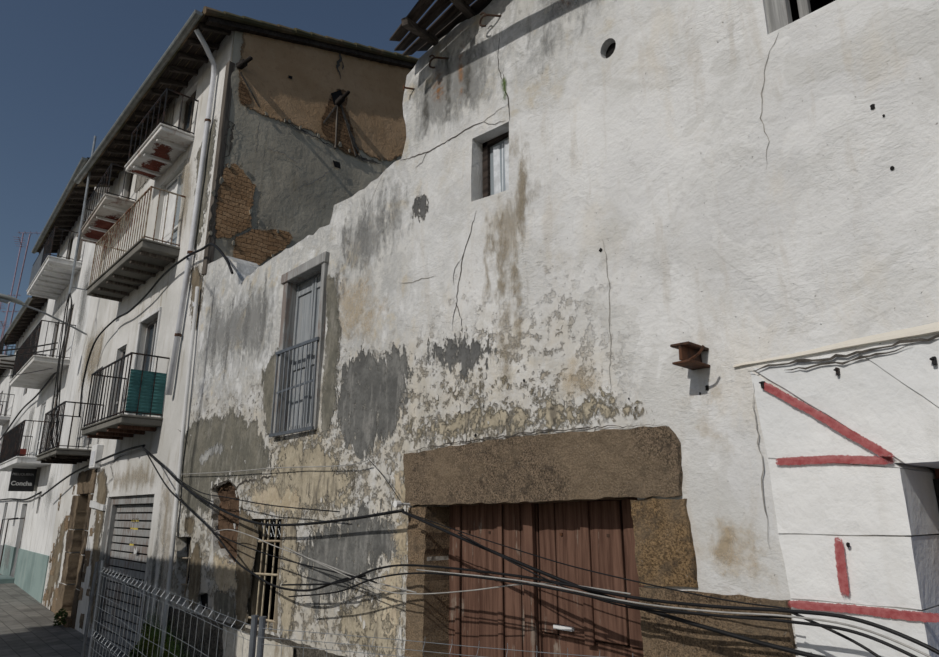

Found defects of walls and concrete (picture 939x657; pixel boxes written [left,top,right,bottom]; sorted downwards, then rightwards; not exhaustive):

spalling [238,32,411,161]
crack [336,53,344,79]
crack [403,32,510,168]
crack [760,35,778,167]
crack [206,115,235,244]
spalling [189,116,293,328]
crack [256,105,382,261]
crack [407,213,476,326]
flaking render [181,272,652,657]
crack [750,334,939,545]
flaking render [42,512,67,610]
flaking render [88,468,108,629]